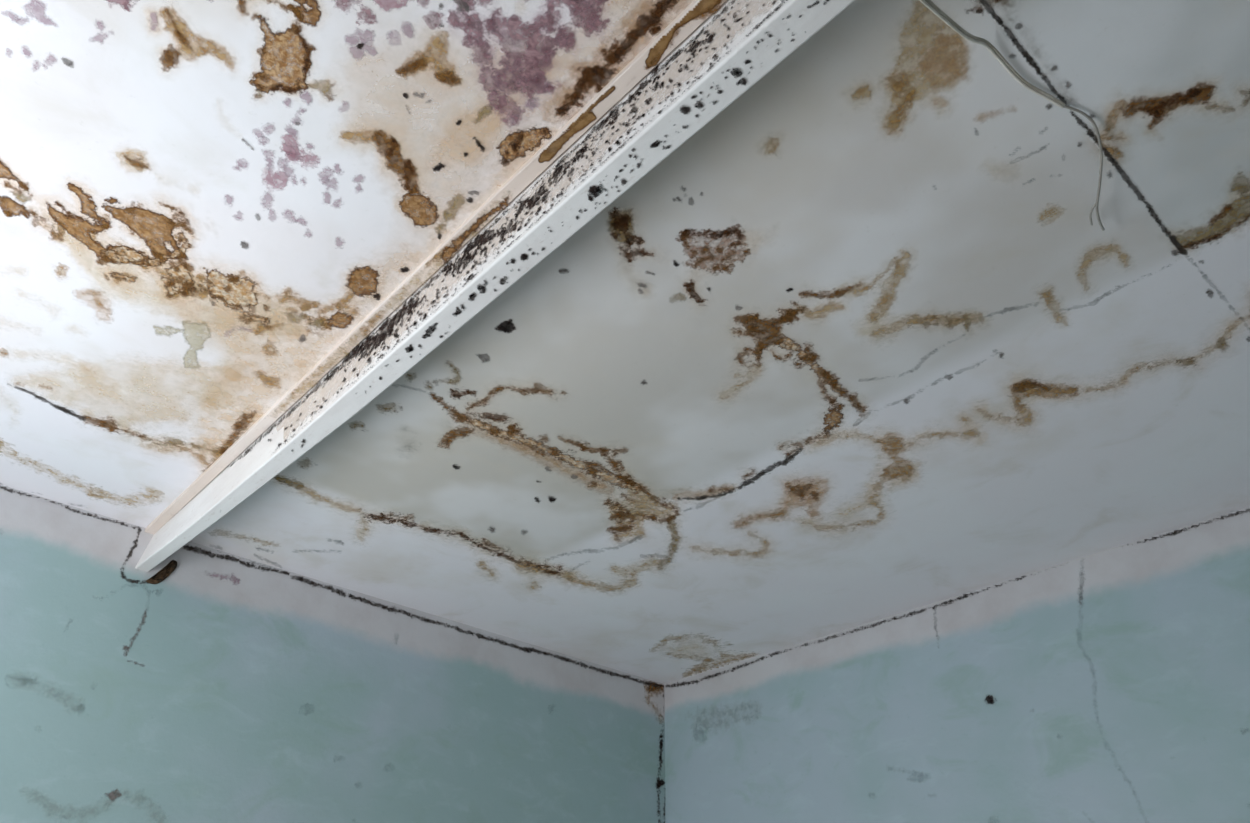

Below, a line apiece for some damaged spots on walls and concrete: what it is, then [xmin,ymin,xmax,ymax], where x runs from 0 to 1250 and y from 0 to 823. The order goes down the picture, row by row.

mould [106,0,131,12]
peeling [249,0,332,101]
peeling [645,0,722,69]
water stain [121,152,147,171]
water stain [226,91,341,235]
crack [979,0,1213,297]
peeling [425,197,508,265]
water stain [268,0,830,451]
water stain [1011,380,1077,422]
water stain [786,483,818,500]
crack [1127,509,1250,545]
crack [183,546,1053,823]